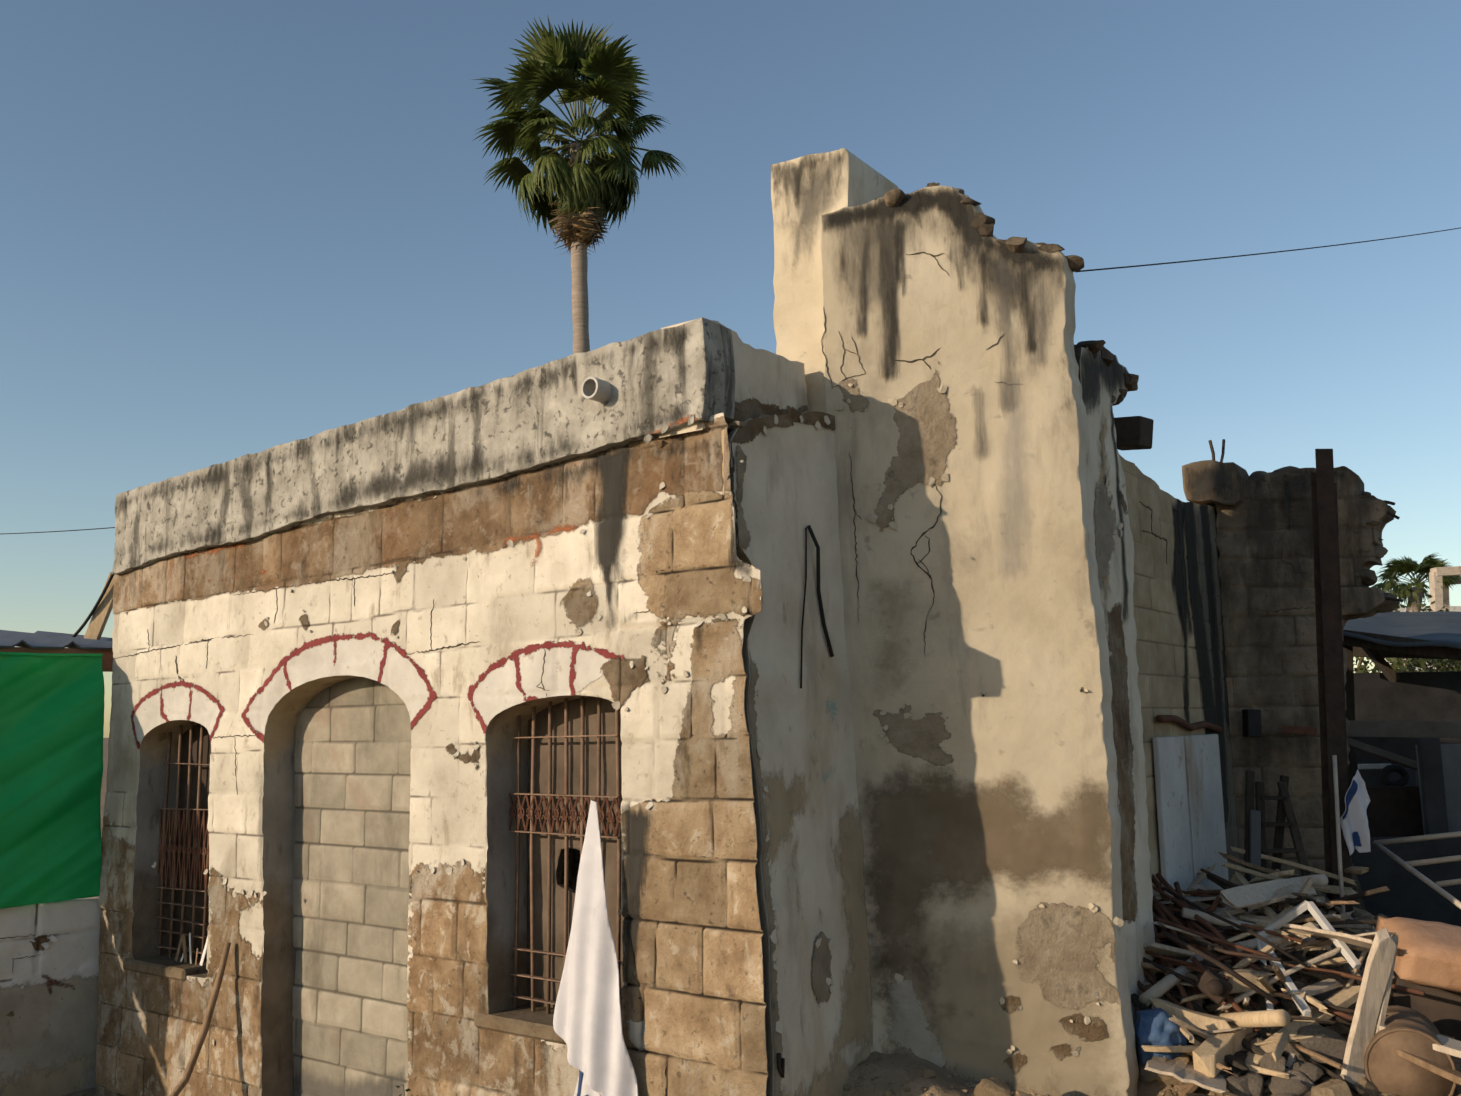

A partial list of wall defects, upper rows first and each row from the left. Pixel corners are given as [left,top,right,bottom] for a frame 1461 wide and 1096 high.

leakage [663,327,684,382]
leakage [773,155,1057,379]
leakage [186,466,224,490]
leakage [336,440,629,624]
spalling [867,361,957,533]
crack [910,484,942,654]
spalling [1094,474,1129,588]
flaking render [113,378,869,1096]
spalling [873,705,954,766]
spalling [999,603,1138,1061]
flaking render [0,812,267,1096]
leakage [782,772,1112,1096]